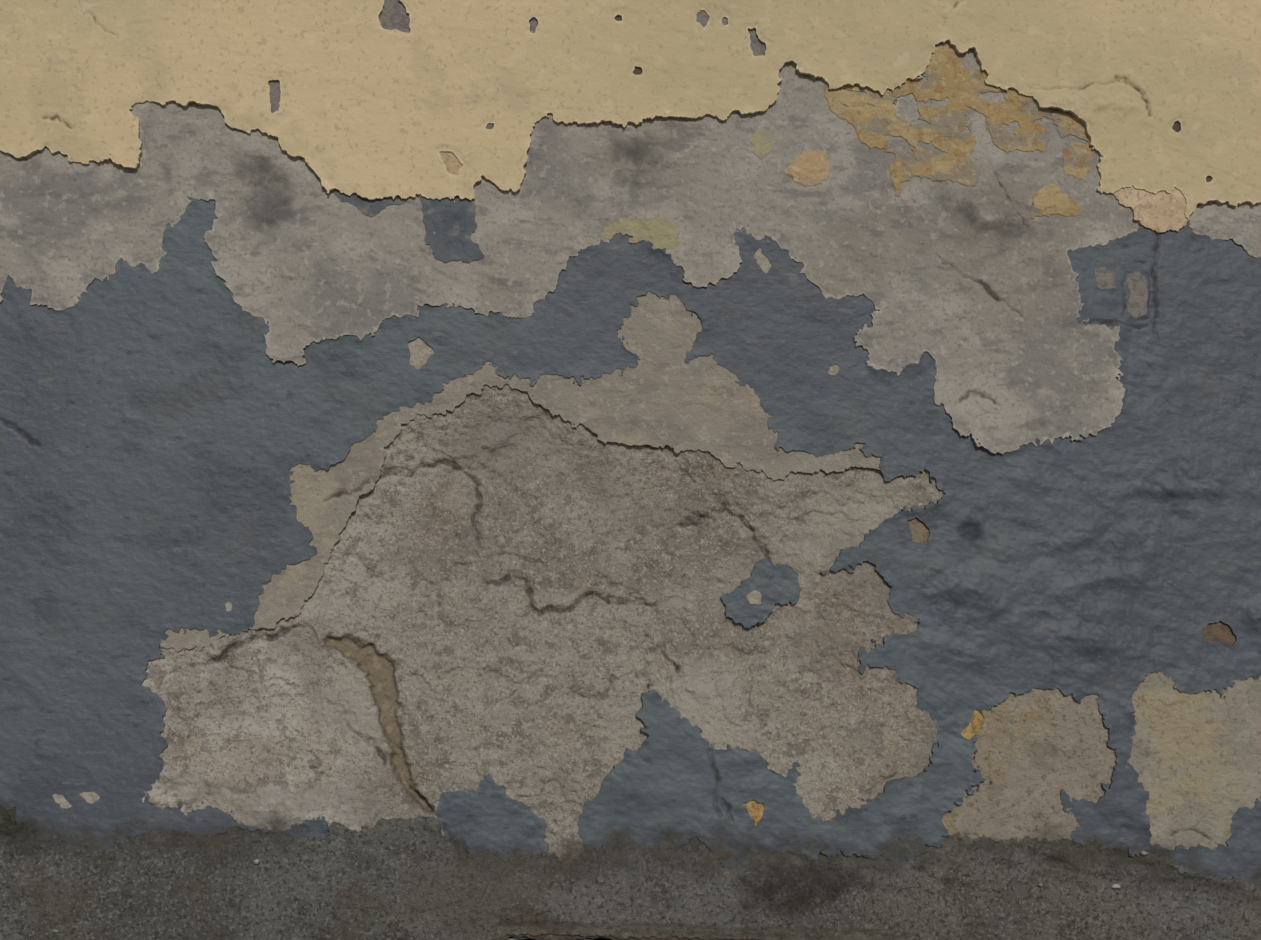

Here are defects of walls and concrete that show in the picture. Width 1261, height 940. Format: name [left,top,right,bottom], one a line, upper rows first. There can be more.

peeling [748,29,766,56]
peeling [0,41,1261,455]
crack [382,462,480,522]
flaking render [142,291,945,861]
crack [495,577,622,614]
peeling [1202,621,1236,646]
peeling [942,672,1261,851]
peeling [53,792,100,809]